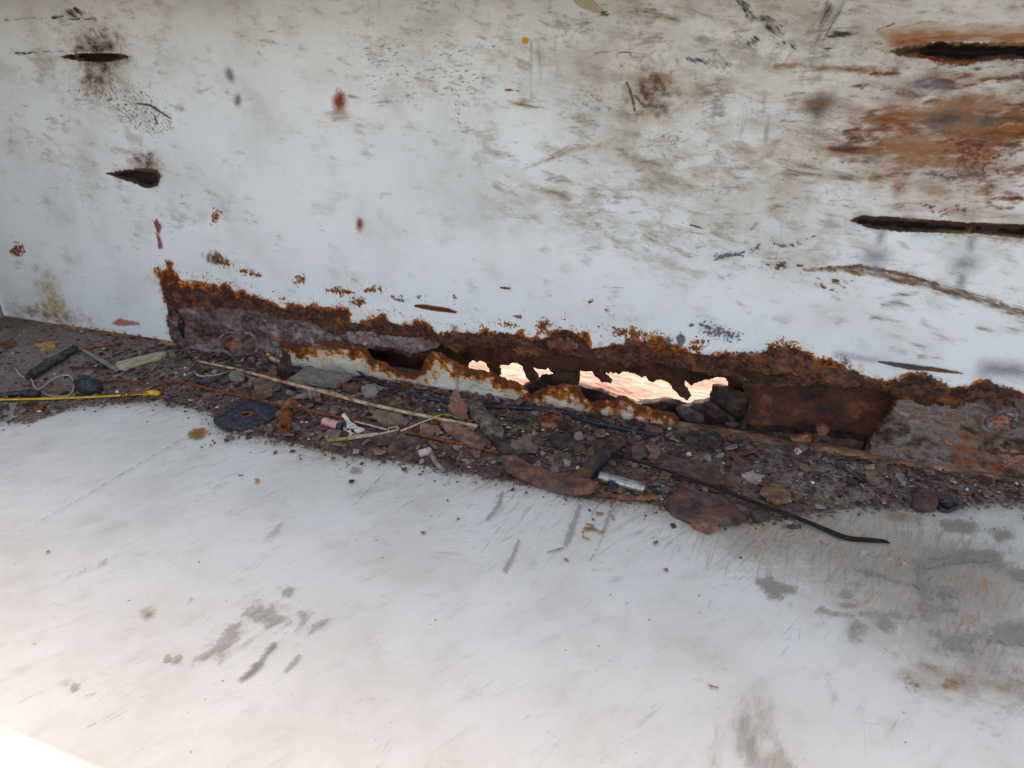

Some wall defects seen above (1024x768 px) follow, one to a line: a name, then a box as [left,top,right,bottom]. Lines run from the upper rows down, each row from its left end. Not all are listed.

rust [75,33,114,85]
rust [891,31,1024,46]
rust [625,69,669,115]
rust [826,61,1024,224]
rust [9,241,25,257]
peeling [665,316,744,348]
rust [153,254,1024,478]